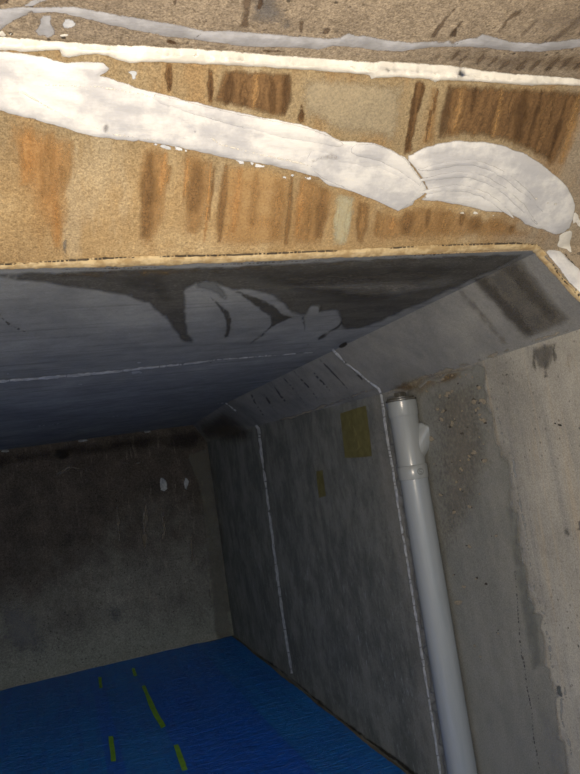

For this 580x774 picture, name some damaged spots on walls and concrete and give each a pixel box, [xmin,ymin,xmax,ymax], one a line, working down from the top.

rust [207,70,291,115]
damp [306,82,400,137]
rust [404,81,425,153]
rust [425,86,580,163]
damp [477,56,580,71]
rust [142,153,170,239]
rust [185,160,331,244]
damp [334,196,352,243]
damp [1,255,565,341]